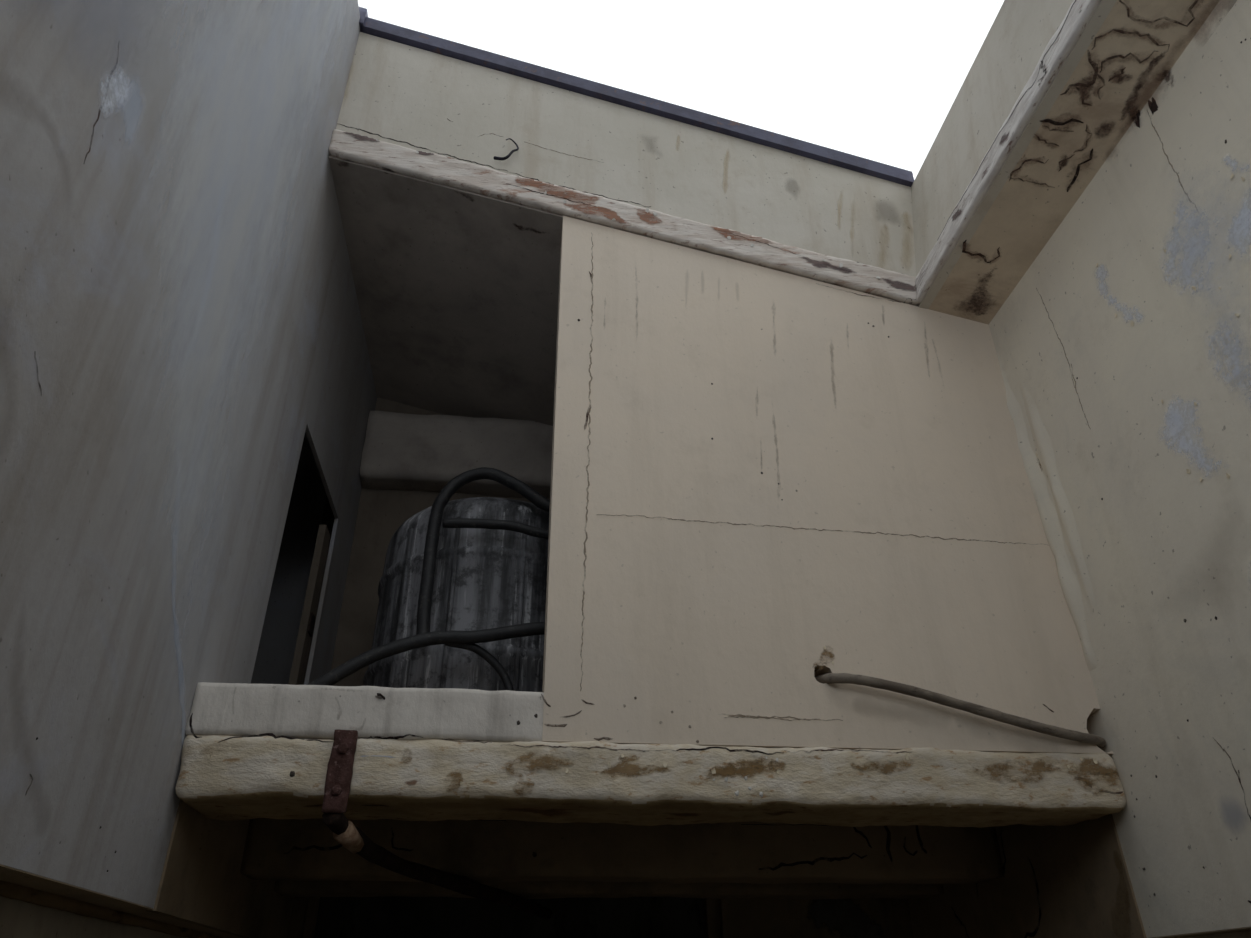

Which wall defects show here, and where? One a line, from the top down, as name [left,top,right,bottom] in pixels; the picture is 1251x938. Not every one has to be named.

crack [937,0,1201,263]
peeling [515,177,661,228]
peeling [712,227,768,247]
peeling [803,257,853,273]
peeling [876,276,916,291]
crack [340,124,1025,755]
crack [189,713,423,743]
crack [1215,740,1251,820]
crack [741,824,927,871]